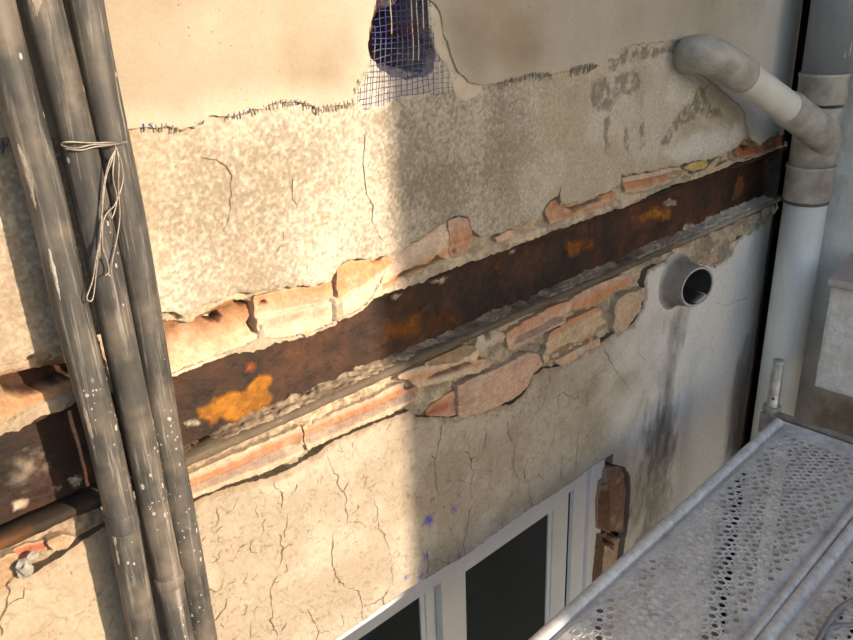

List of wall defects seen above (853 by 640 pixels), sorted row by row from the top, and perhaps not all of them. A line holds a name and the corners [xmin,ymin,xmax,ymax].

spalling [368,0,483,102]
crack [202,157,232,229]
crack [363,133,381,238]
spalling [162,136,788,377]
spalling [0,346,76,436]
rust [200,375,272,422]
crack [193,211,772,640]
spalling [187,203,779,498]
spalling [0,507,104,591]
crack [0,521,129,640]
crack [138,513,165,640]
spalling [592,461,626,582]